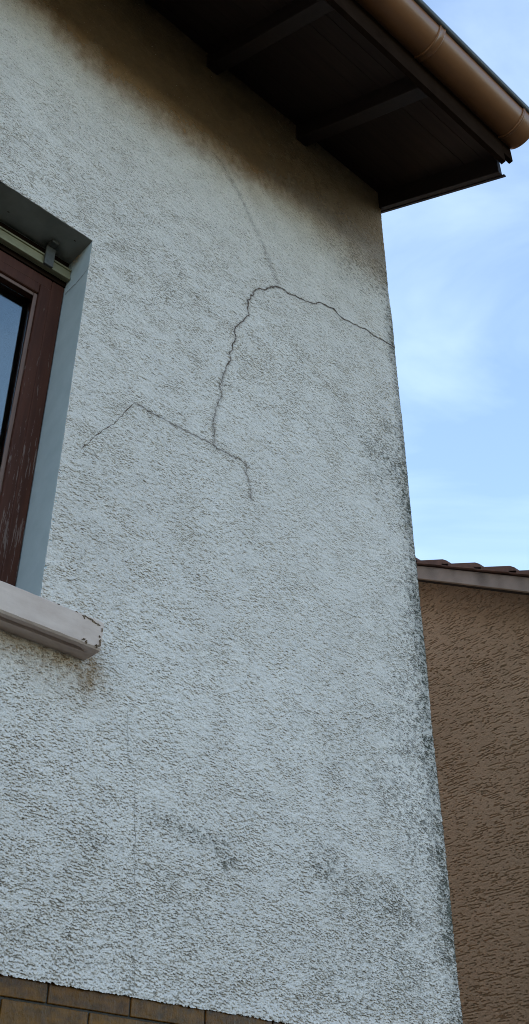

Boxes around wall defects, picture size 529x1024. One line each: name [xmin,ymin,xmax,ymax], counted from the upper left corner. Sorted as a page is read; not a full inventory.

crack [83,240,394,499]